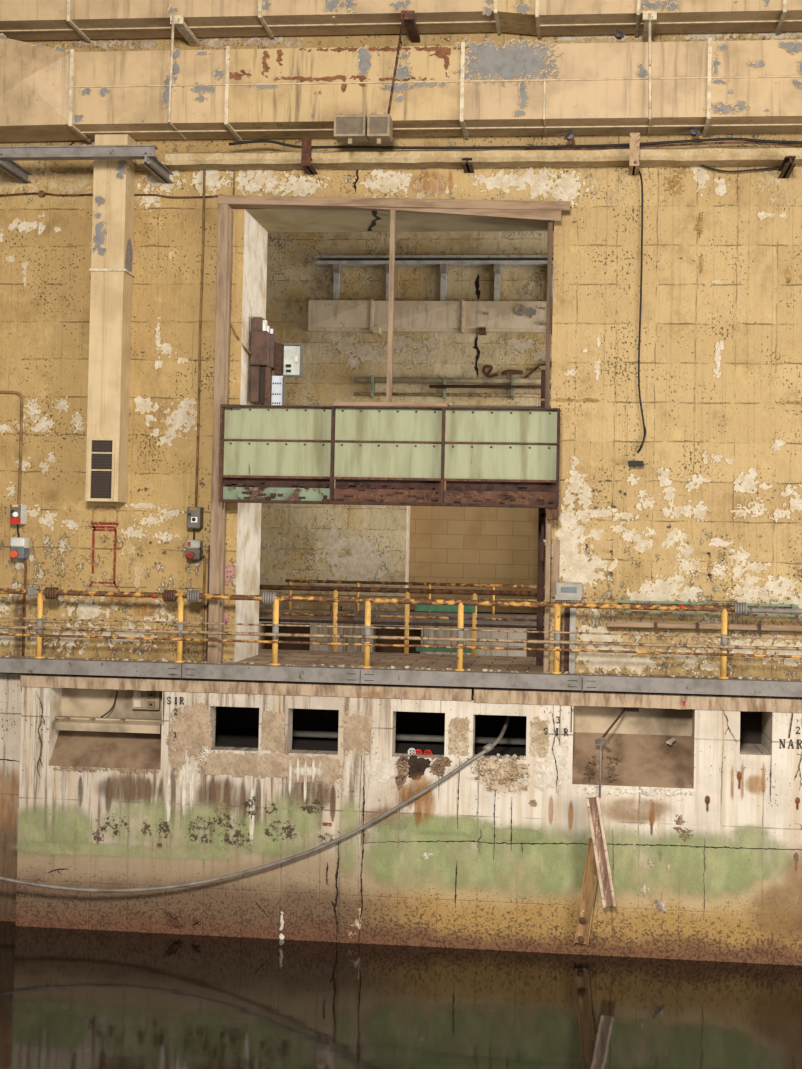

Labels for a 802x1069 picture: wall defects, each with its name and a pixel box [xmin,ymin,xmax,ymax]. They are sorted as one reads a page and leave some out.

corrosion [229,42,433,92]
corrosion [299,44,470,77]
peeling [135,162,335,212]
crack [472,335,480,377]
peeling [544,449,802,609]
peeling [0,502,184,657]
peeling [561,623,802,675]
damp [93,760,336,849]
corrosion [401,779,433,823]
damp [611,801,662,825]
damp [0,778,18,914]
crack [326,754,802,943]